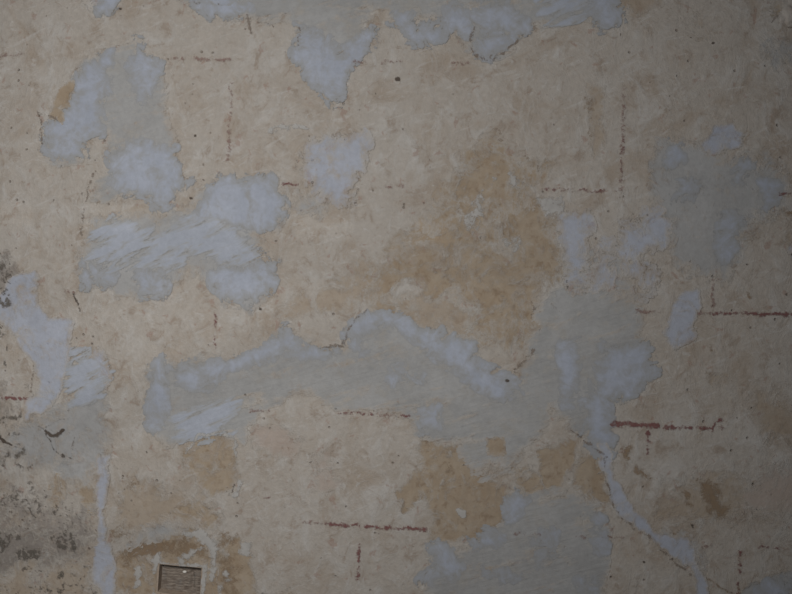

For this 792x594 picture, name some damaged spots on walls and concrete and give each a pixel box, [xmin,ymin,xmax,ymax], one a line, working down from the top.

damp [0,249,21,307]